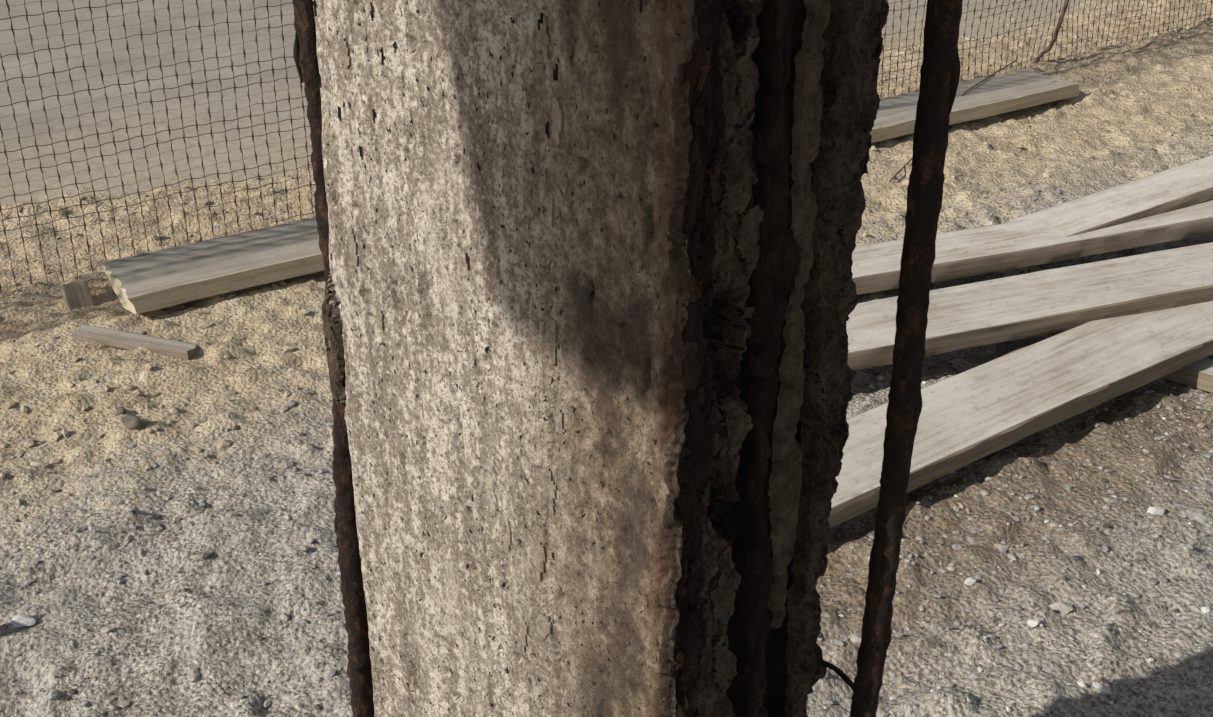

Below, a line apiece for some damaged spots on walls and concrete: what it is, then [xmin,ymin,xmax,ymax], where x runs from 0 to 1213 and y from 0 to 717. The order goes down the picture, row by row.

spalling [876,0,889,63]
peeling [736,35,760,109]
spalling [862,134,872,174]
peeling [715,136,764,318]
peeling [767,0,831,629]
spalling [835,299,858,321]
spalling [659,0,700,717]
corrosion [673,0,734,717]
corrosion [738,0,807,717]
peeling [711,394,753,467]
spalling [838,392,852,461]
spalling [810,644,827,687]